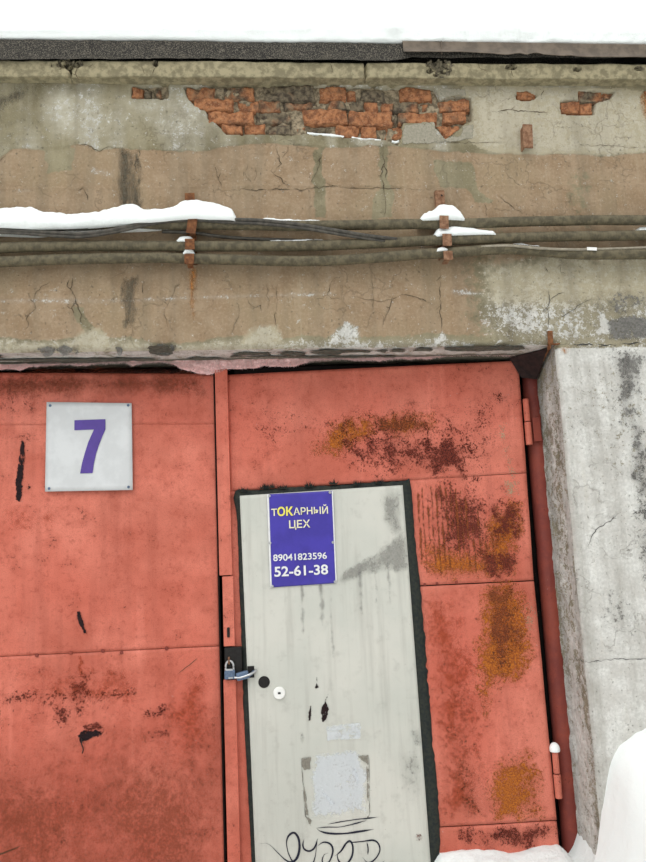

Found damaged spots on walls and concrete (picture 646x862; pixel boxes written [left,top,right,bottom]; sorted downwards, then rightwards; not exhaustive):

flaking render [131,87,169,100]
flaking render [185,85,471,146]
flaking render [516,91,536,101]
flaking render [560,91,613,116]
leakage [119,149,139,206]
crack [213,145,412,214]
crack [317,277,442,332]
crack [547,293,639,347]
leakage [612,349,646,519]
corrosion [257,393,535,813]
corrosion [3,657,135,728]
corrosion [456,749,558,849]